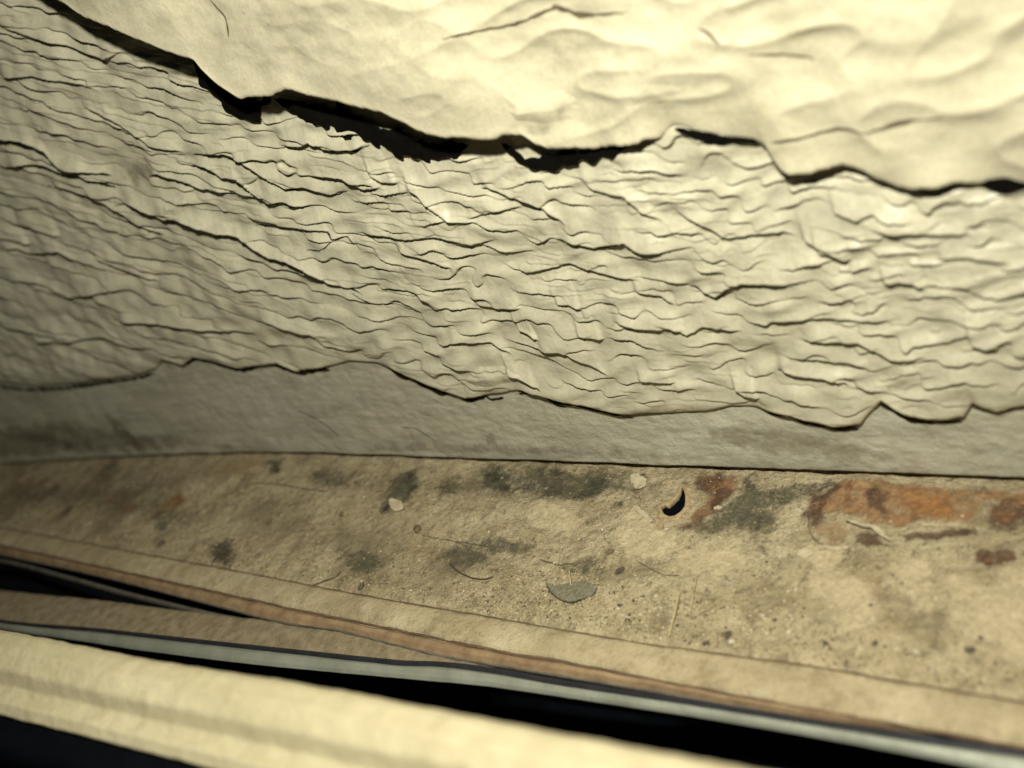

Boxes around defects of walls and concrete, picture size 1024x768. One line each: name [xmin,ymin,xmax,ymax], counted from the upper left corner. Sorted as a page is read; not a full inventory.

crack [193,61,469,162]
crack [501,143,632,172]
crack [674,118,945,157]
crack [978,177,1024,193]
peeling [0,0,1024,428]
crack [390,369,631,418]
crack [880,404,1024,427]
damp [381,470,417,512]
damp [482,464,636,506]
rust [681,474,735,529]
damp [699,478,830,533]
rust [801,479,1024,546]